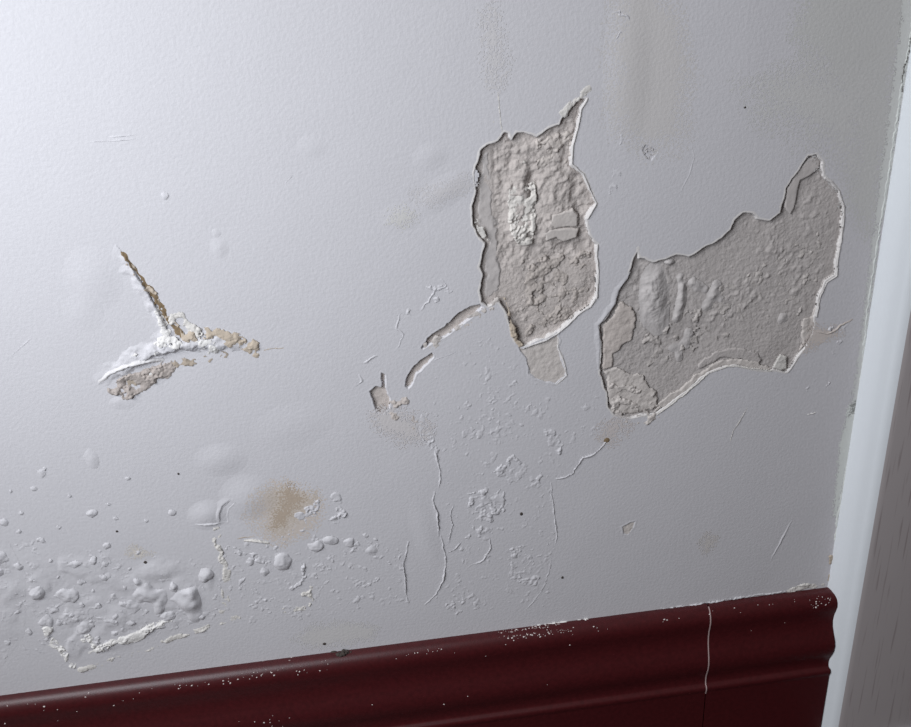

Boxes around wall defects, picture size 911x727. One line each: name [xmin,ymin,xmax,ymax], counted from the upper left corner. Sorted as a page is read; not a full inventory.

peeling [356,370,393,415]
spalling [403,97,600,391]
spalling [593,152,845,420]